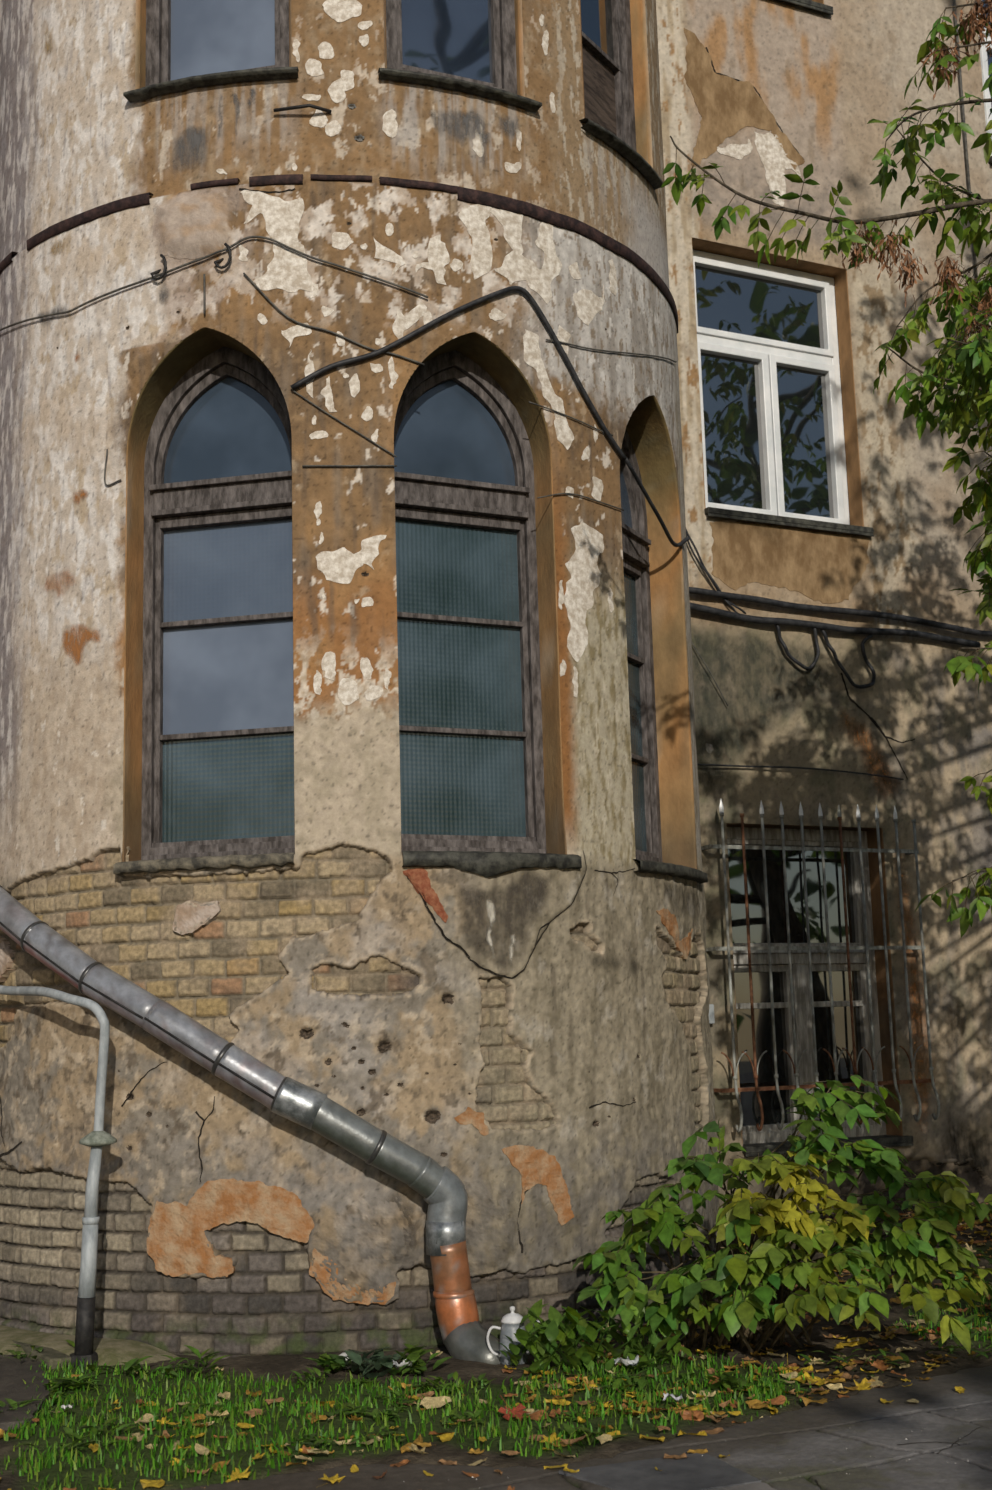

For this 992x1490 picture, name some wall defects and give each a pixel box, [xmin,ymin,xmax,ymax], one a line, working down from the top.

flaking render [0,846,448,1048]